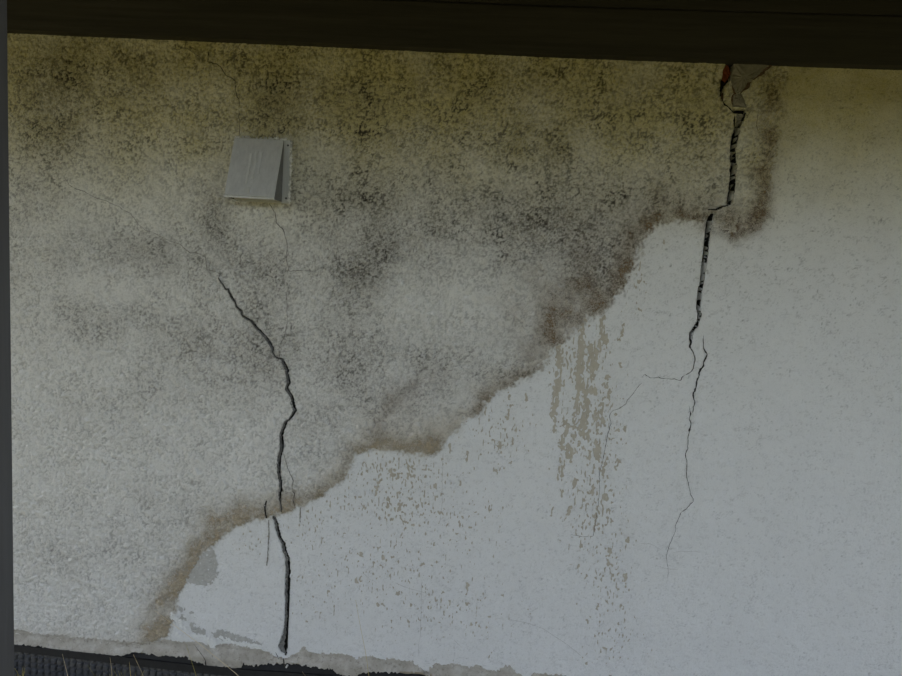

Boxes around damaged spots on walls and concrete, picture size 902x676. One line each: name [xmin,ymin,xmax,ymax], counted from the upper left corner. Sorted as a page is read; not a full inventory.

crack [65,179,302,669]
water stain [144,497,301,642]
peeling [278,392,540,640]
peeling [547,313,637,665]
water stain [539,211,661,345]
crack [570,113,746,570]
water stain [723,128,777,239]